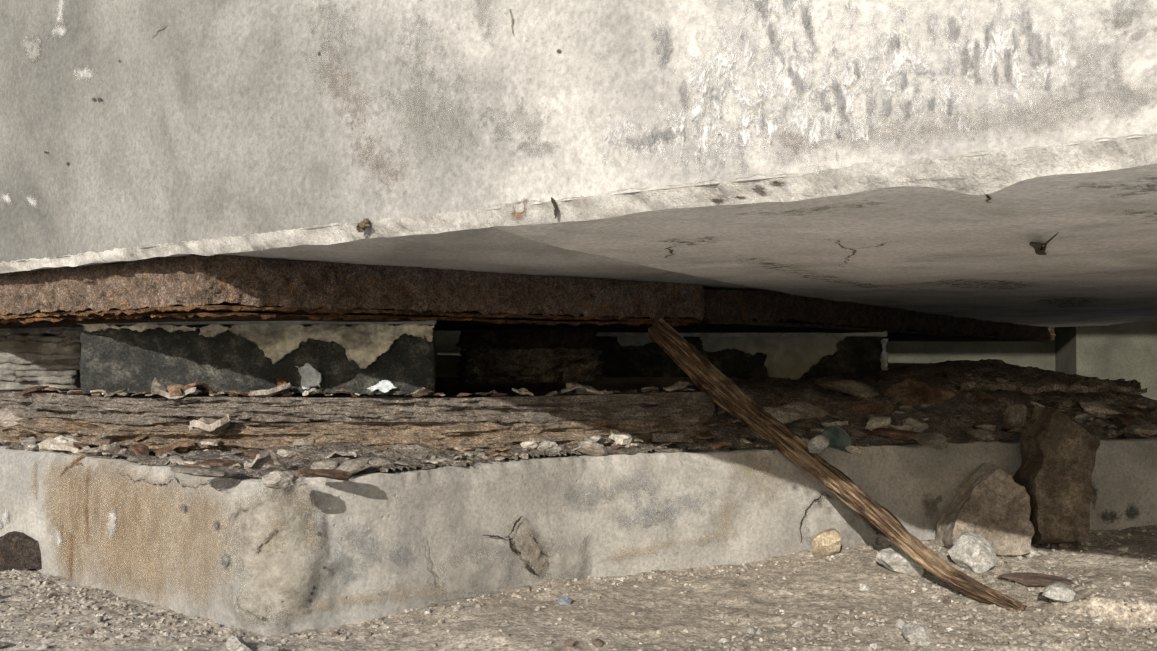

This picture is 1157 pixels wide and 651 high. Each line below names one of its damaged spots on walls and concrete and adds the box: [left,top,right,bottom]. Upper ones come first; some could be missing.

crack [826,239,963,290]
rust [0,305,1053,342]
peeling [90,389,129,397]
crack [483,515,590,575]